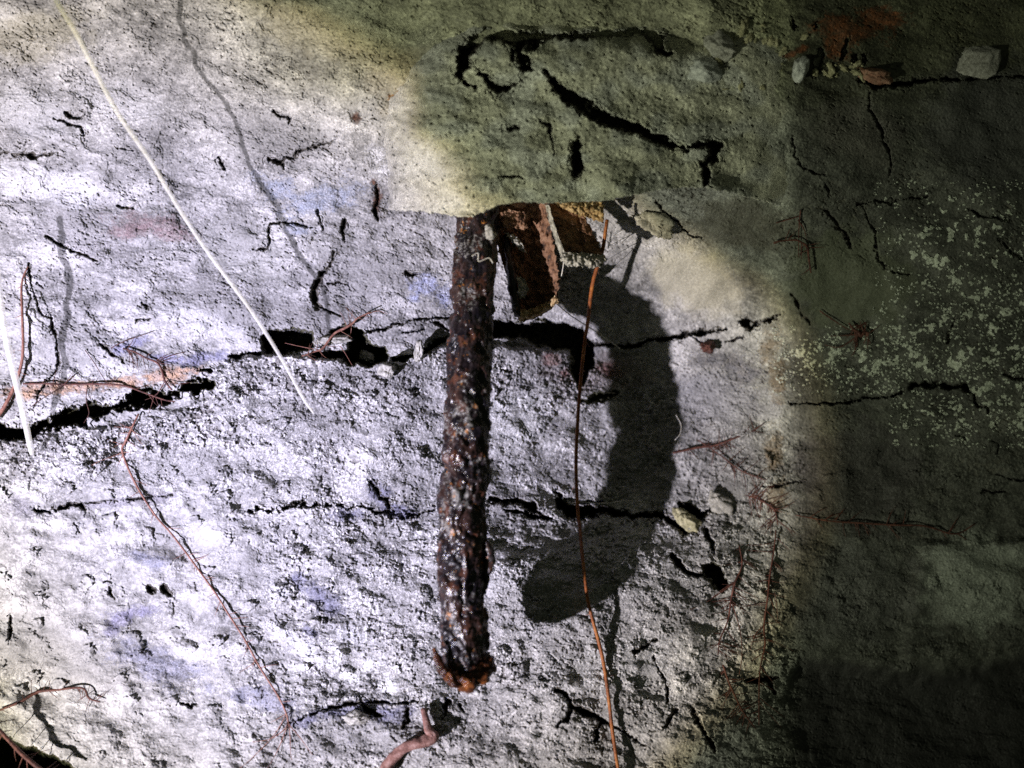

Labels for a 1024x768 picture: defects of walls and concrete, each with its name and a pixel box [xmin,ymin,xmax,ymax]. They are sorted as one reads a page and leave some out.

crack [452,26,725,187]
rust [500,209,528,230]
crack [791,73,1024,276]
crack [0,262,261,443]
crack [366,316,450,333]
crack [593,294,811,353]
crack [790,377,1024,494]
rust [460,526,496,603]
crack [488,486,716,579]
rust [433,647,448,676]